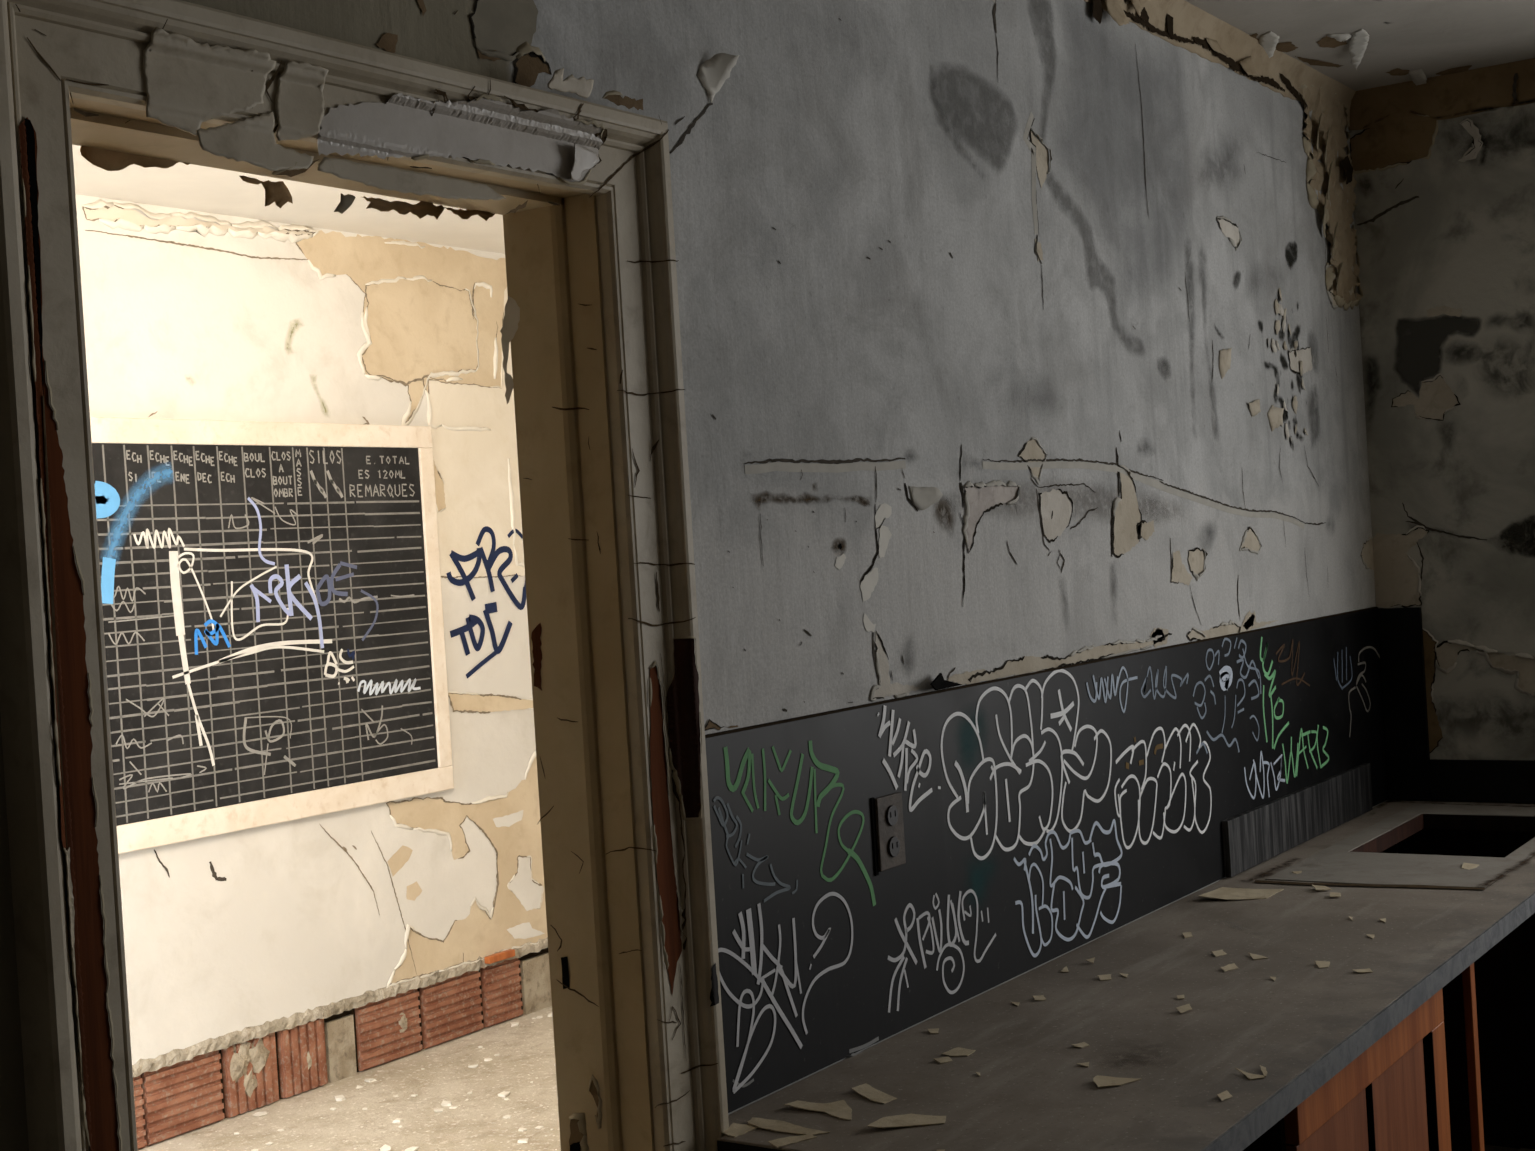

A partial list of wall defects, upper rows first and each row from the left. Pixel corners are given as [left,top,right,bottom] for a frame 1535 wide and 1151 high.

peeling [470,0,643,110]
peeling [1206,29,1369,77]
peeling [143,27,607,221]
peeling [1298,84,1438,310]
peeling [1286,243,1297,268]
peeling [1249,289,1313,448]
peeling [19,117,552,1151]
peeling [962,437,1073,553]
peeling [1113,465,1155,558]
crack [960,430,1328,598]
crack [1170,538,1202,625]
damp [1501,516,1535,555]